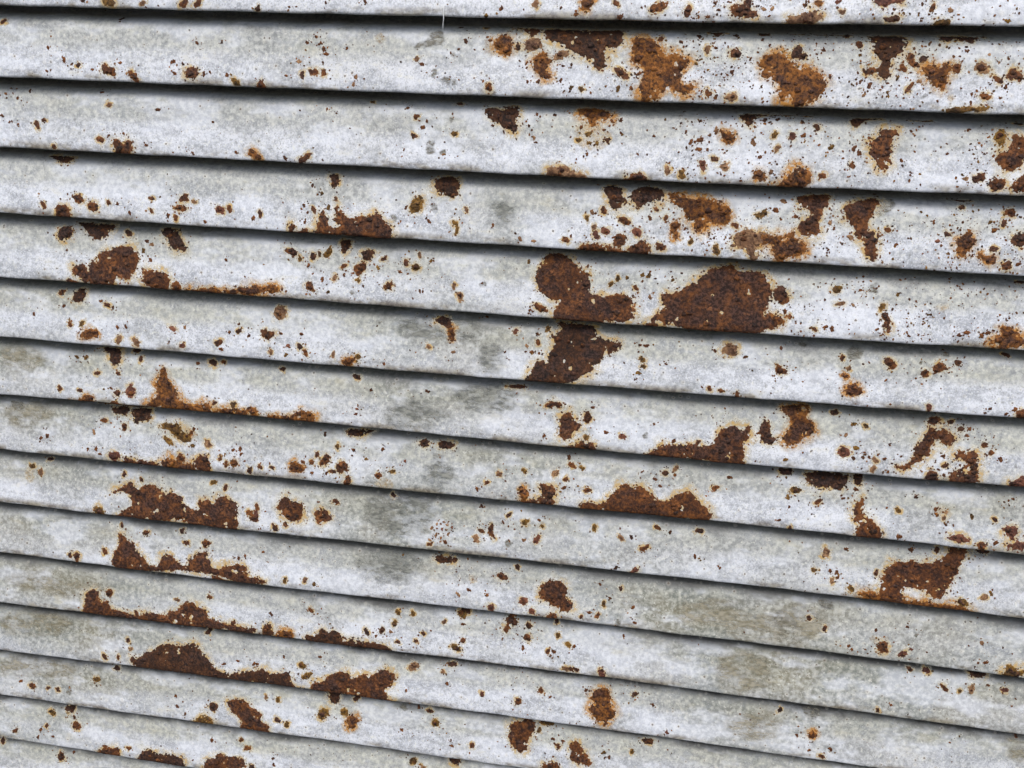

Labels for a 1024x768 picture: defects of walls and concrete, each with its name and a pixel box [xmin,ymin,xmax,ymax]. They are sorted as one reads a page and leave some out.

corrosion [38,147,1024,768]
corrosion [369,0,1024,400]